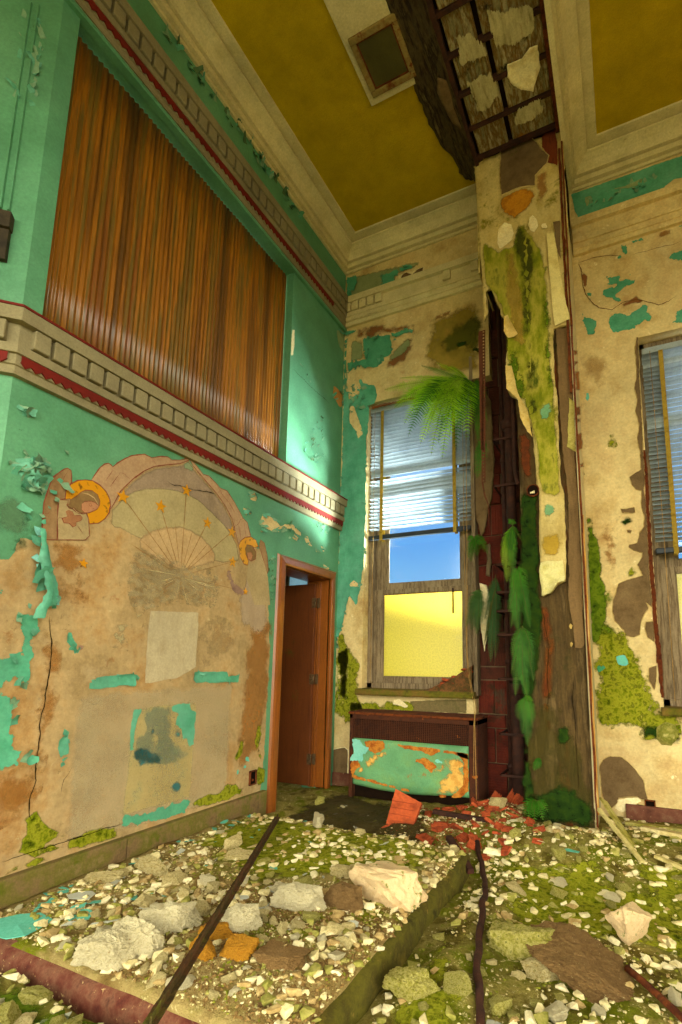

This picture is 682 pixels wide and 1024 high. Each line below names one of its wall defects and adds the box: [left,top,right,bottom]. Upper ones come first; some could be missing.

flaking render [499,138,549,196]
peeling [380,264,425,285]
leakage [426,307,479,371]
flaking render [504,315,518,338]
flaking render [505,365,533,437]
flaking render [582,274,655,642]
flaking render [0,328,413,877]
flaking render [648,665,657,690]
crack [29,619,53,819]
flaking render [599,756,655,808]